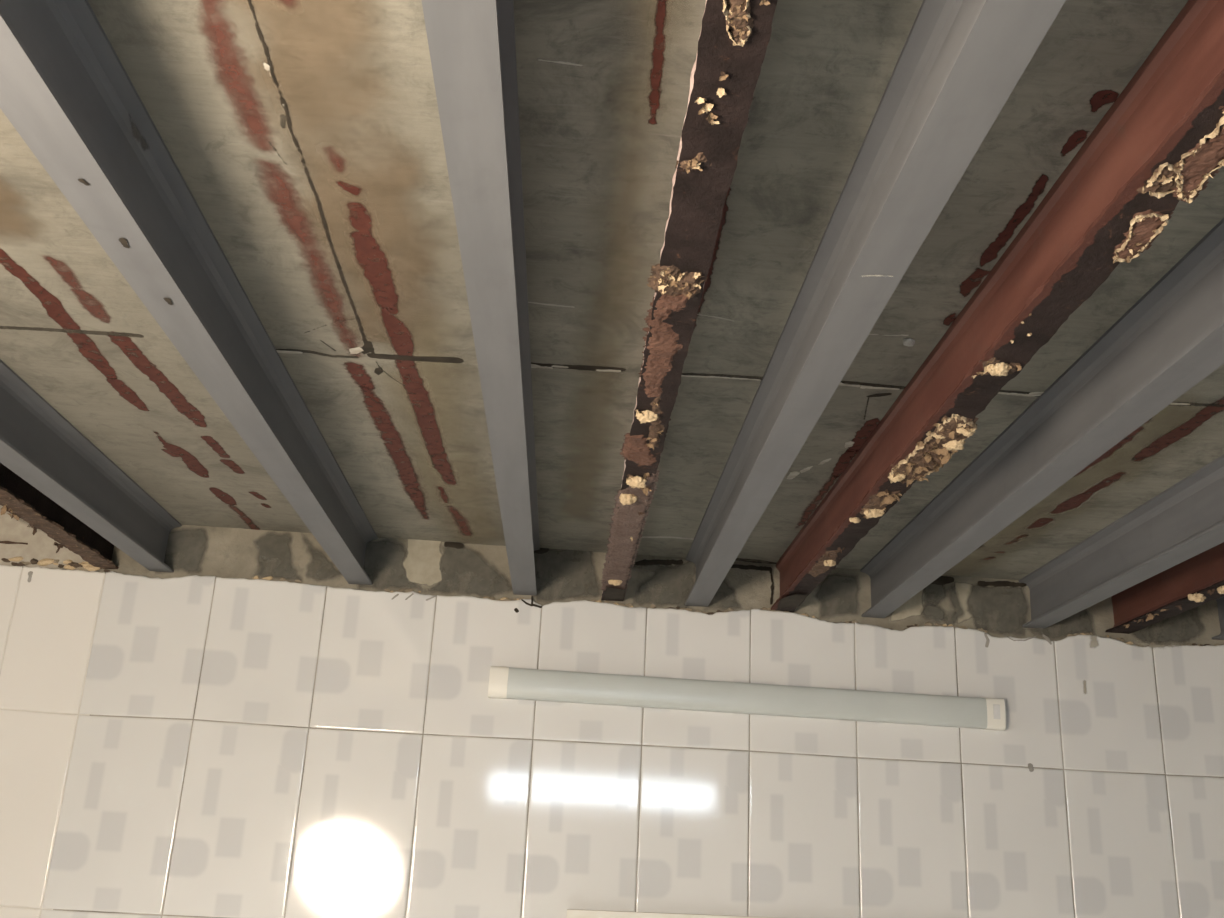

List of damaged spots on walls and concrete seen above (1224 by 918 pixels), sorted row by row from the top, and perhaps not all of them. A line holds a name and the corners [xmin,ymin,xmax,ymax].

crack [248,0,464,386]
peeling [1113,214,1169,263]
crack [0,326,144,338]
crack [531,362,626,371]
crack [682,372,763,380]
peeling [972,361,1022,379]
crack [841,381,905,419]
crack [999,389,1040,397]
peeling [849,414,975,523]
flaking render [1,542,110,572]
spalling [590,579,633,607]
peeling [1066,586,1224,647]